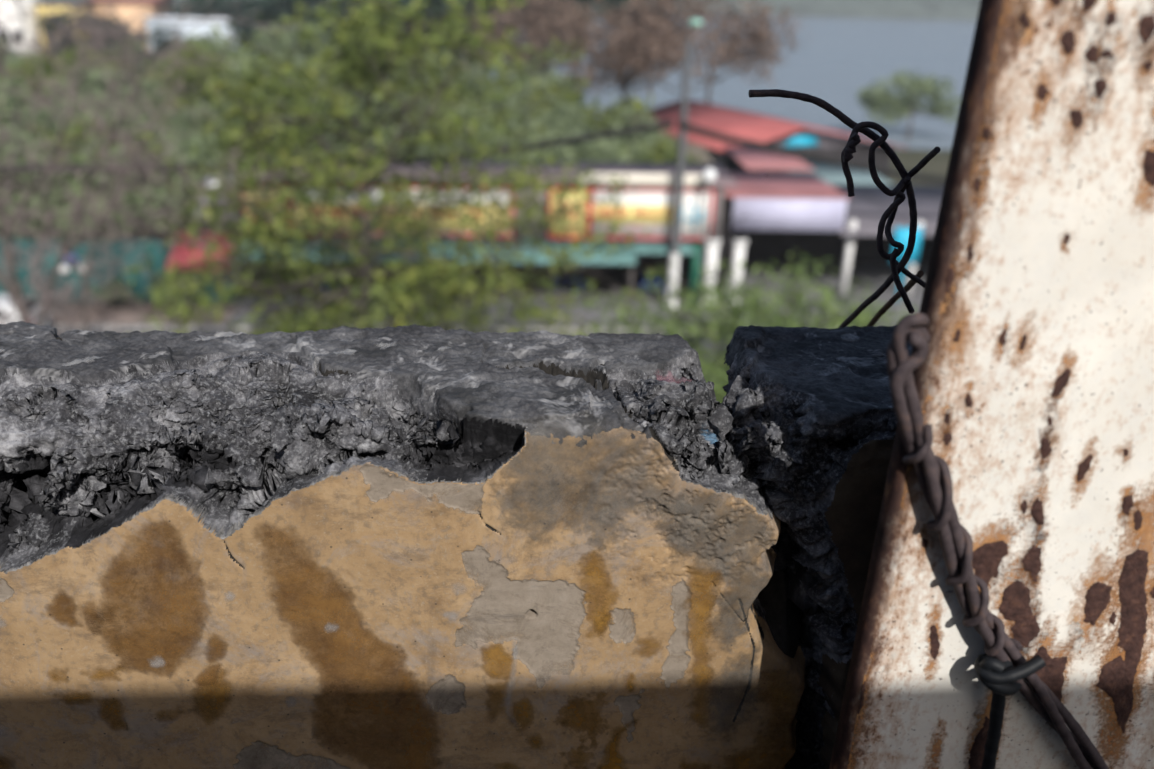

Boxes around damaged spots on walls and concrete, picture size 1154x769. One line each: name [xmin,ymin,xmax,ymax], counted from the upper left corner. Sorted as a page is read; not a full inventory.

rust [1032,0,1154,143]
rust [1135,141,1154,211]
water stain [50,523,224,684]
spalling [0,321,595,602]
water stain [265,531,440,769]
peeling [455,545,587,689]
water stain [710,650,758,731]
crack [714,584,764,722]
spalling [606,352,898,664]
rust [925,605,943,680]
rust [923,382,974,458]
rust [966,354,1154,769]